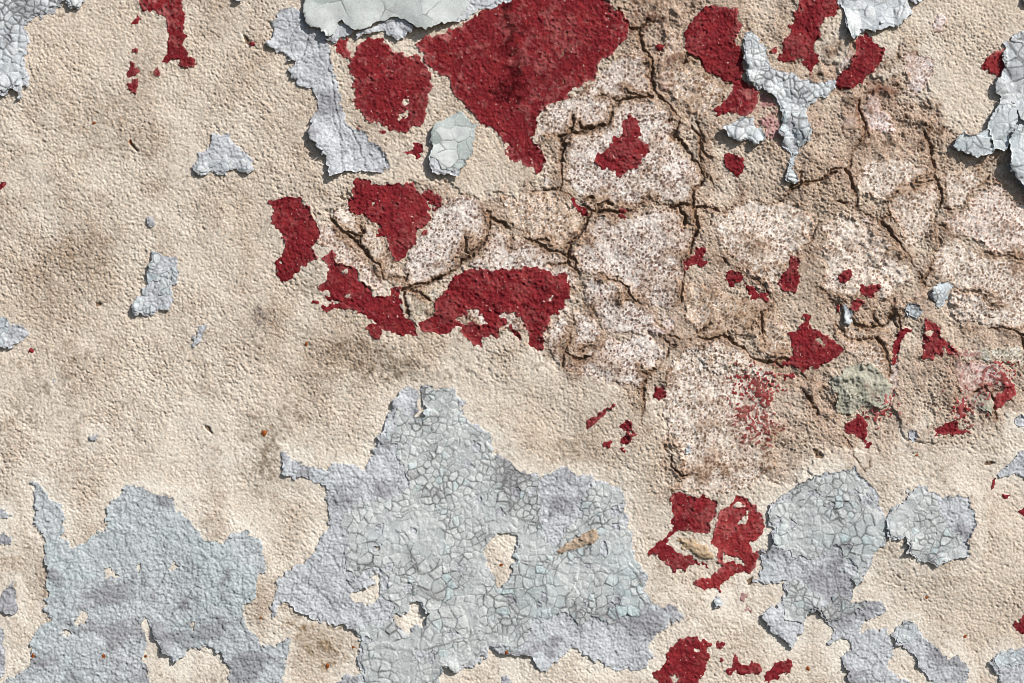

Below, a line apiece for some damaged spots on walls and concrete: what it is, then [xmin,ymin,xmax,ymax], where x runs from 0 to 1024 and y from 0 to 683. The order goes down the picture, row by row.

peeling [266,0,512,176]
peeling [722,0,923,184]
crack [330,8,719,367]
spalling [316,30,1024,494]
crack [638,257,818,415]
crack [820,287,901,378]
crack [784,100,951,287]
crack [990,306,1024,349]
peeling [0,481,290,683]
peeling [269,385,684,683]
crack [664,446,687,477]
peeling [744,466,977,683]